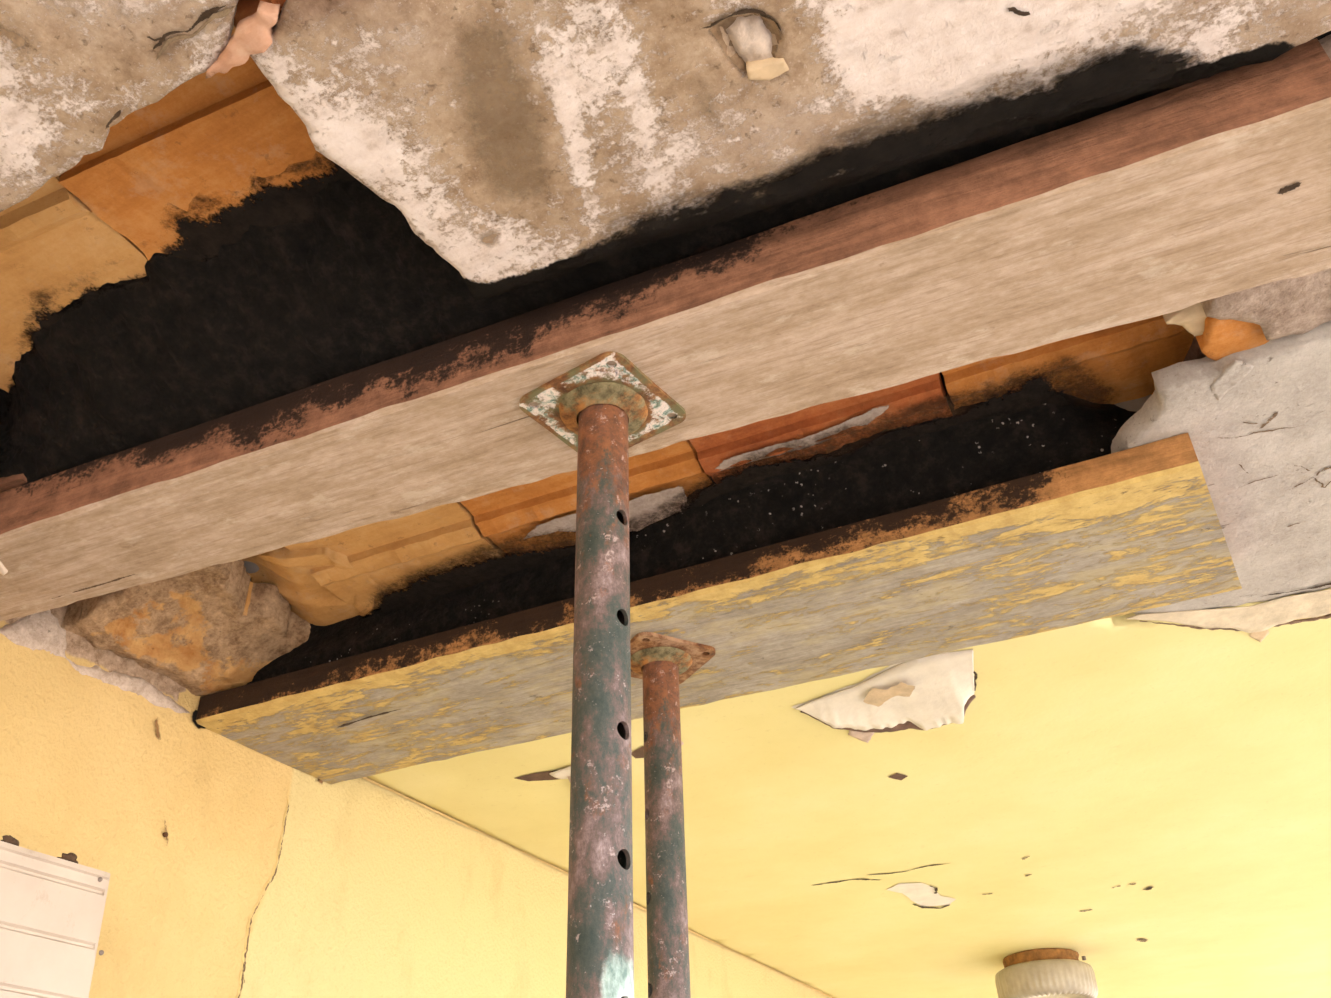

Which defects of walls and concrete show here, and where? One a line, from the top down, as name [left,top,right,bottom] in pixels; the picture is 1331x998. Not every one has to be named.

crack [147,4,237,60]
spalling [703,8,789,81]
crack [1008,7,1030,16]
water stain [463,30,543,196]
crack [1218,411,1331,489]
spalling [241,547,379,626]
peeling [1126,583,1331,642]
spalling [0,610,190,713]
peeling [791,649,978,743]
peeling [515,766,571,782]
crack [235,788,289,998]
peeling [887,883,956,909]